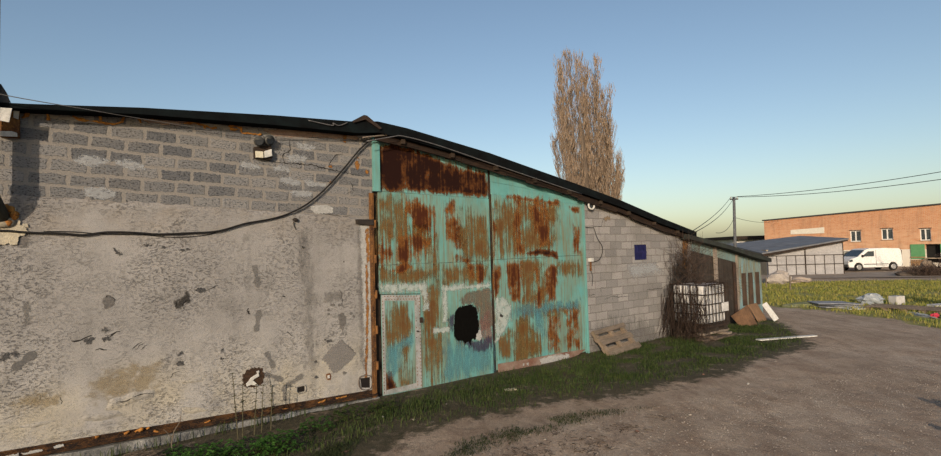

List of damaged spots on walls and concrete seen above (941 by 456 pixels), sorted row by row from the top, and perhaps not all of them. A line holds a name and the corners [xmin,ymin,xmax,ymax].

spalling [83,327,111,350]
spalling [102,296,115,309]
peeling [327,225,372,390]
corrosion [355,144,582,394]